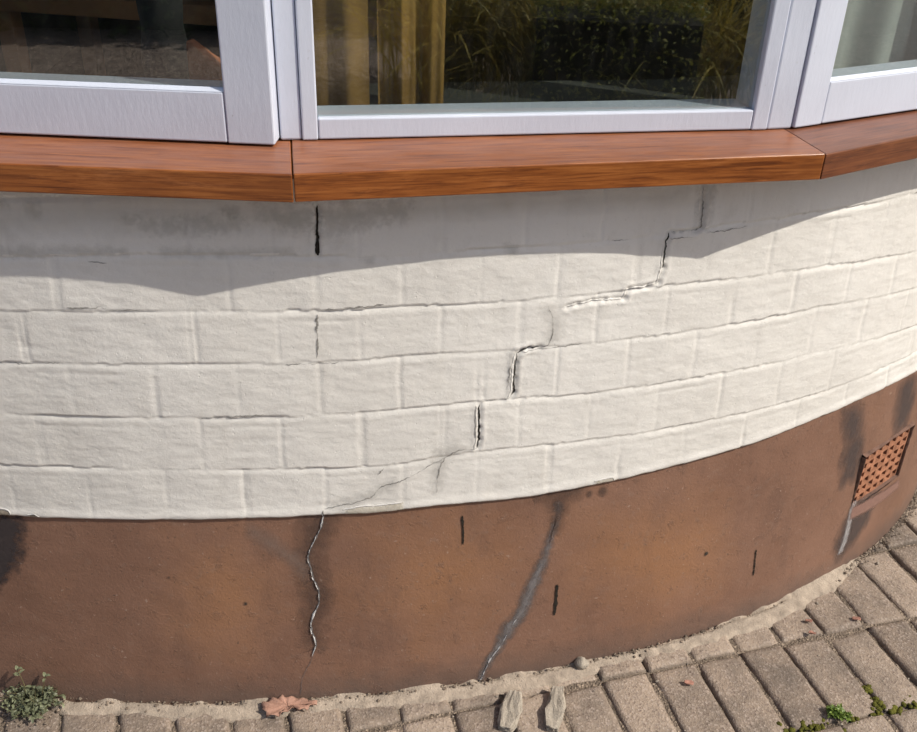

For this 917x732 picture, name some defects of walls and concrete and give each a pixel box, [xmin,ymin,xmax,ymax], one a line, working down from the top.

damp [0,515,26,584]
crack [286,188,745,695]